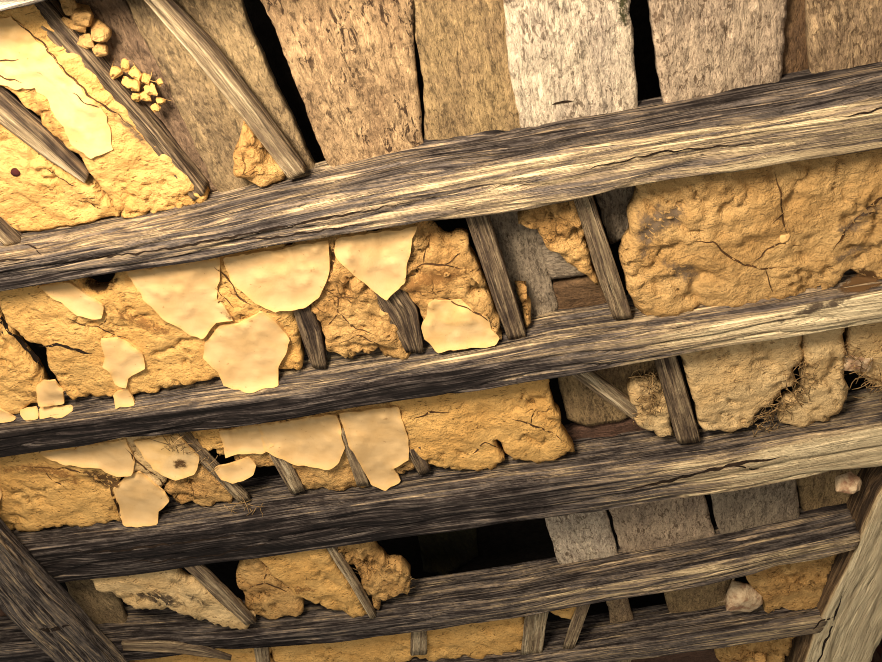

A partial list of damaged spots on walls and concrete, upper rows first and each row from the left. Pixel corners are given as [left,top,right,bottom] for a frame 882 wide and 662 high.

flaking render [0,16,113,159]
flaking render [0,379,73,423]
crack [0,316,92,367]
flaking render [38,278,118,320]
flaking render [101,337,145,409]
crack [0,200,417,347]
flaking render [119,224,461,393]
flaking render [421,299,499,353]
crack [690,175,798,293]
crack [833,197,882,250]
flaking render [4,434,200,527]
flaking render [214,406,409,491]